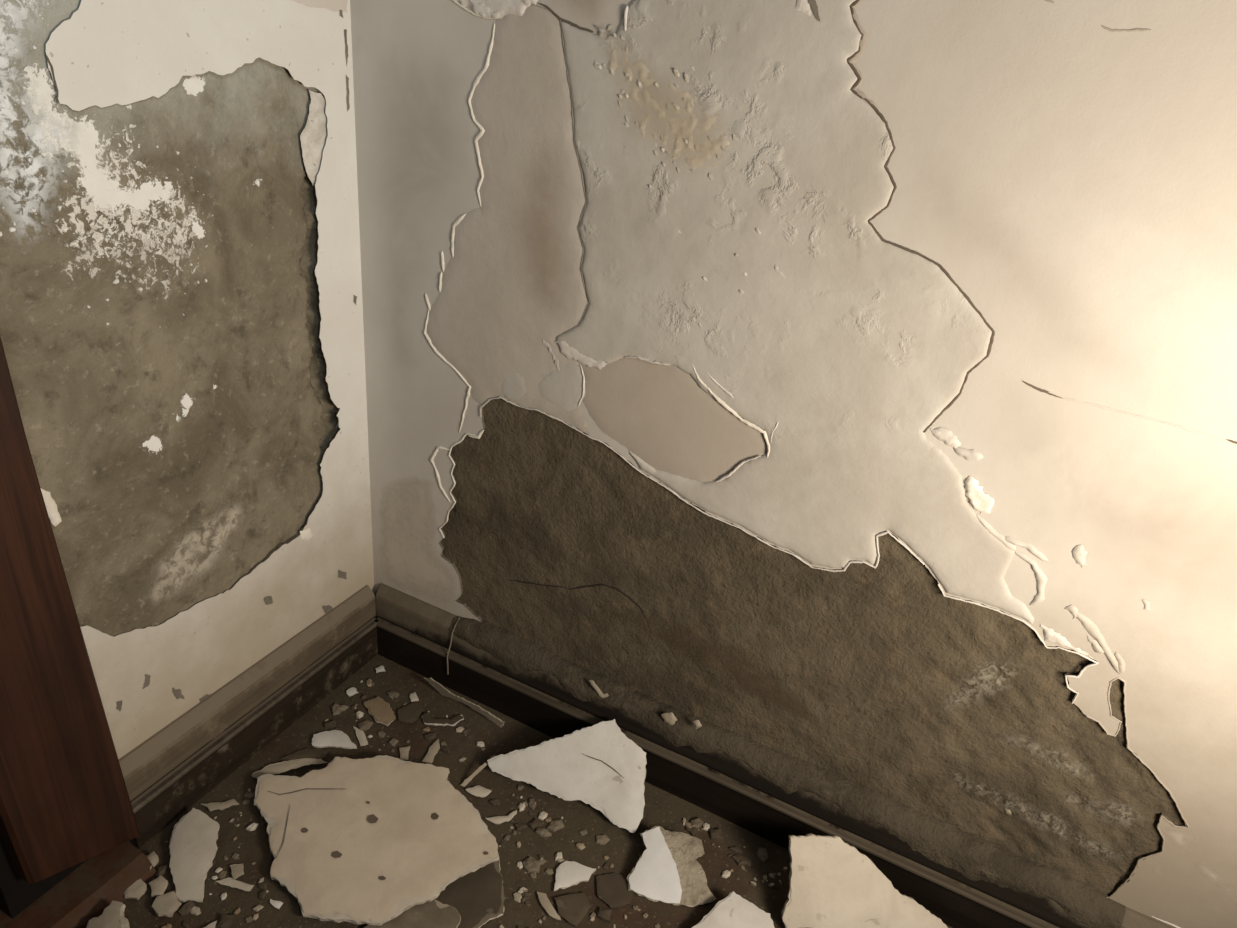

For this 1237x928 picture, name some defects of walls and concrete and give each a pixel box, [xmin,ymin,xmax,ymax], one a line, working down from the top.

water stain [0,0,64,229]
peeling [291,0,350,111]
spalling [0,0,340,637]
crack [1021,379,1237,445]
spalling [439,339,1189,898]